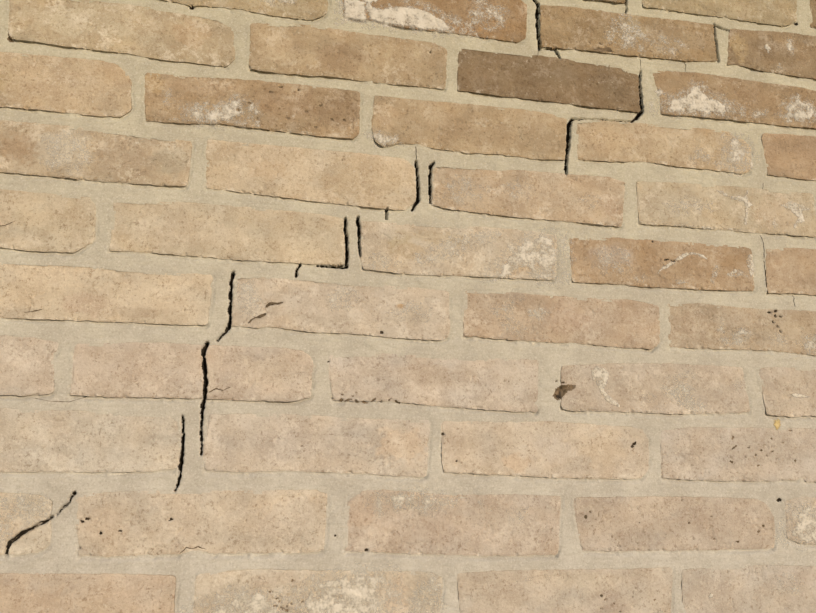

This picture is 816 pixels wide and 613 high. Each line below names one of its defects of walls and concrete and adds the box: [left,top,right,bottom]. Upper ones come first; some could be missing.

crack [533,0,560,59]
crack [564,60,643,175]
crack [411,147,434,212]
crack [295,218,361,278]
crack [174,273,283,491]
crack [5,492,76,554]